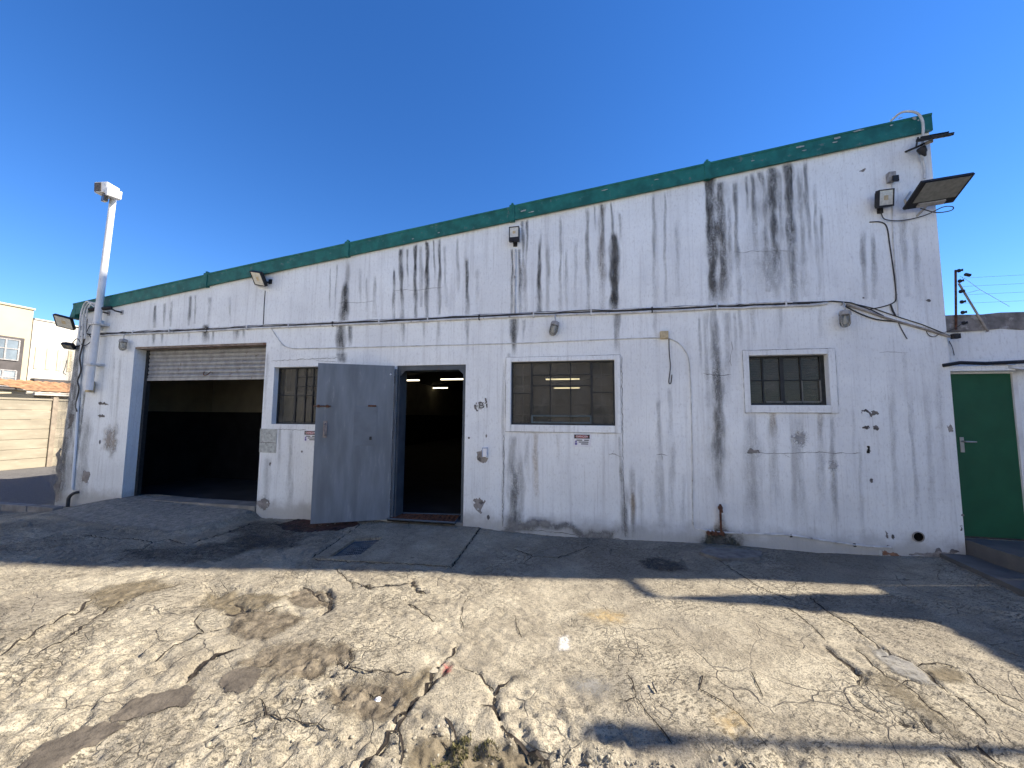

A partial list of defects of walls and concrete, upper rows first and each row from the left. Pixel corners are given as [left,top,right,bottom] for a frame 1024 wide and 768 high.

water stain [393,242,441,308]
water stain [586,208,619,323]
water stain [705,178,754,296]
water stain [765,165,807,254]
flaking render [473,498,490,520]
water stain [505,519,613,539]
crack [1,599,121,655]
crack [154,604,250,683]
crack [720,561,1024,768]
crack [259,698,333,730]
crack [336,659,440,768]
crack [492,680,550,768]